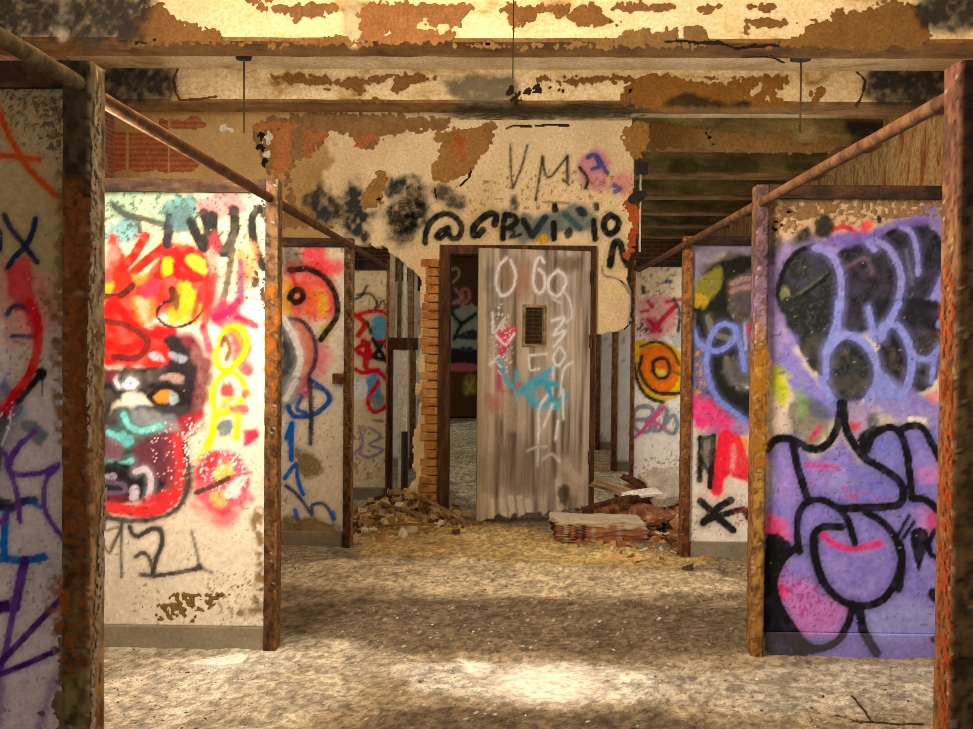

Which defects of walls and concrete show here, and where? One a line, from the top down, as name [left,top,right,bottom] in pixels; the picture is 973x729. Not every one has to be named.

peeling [98,0,723,52]
crack [664,40,785,63]
peeling [743,0,932,52]
flaking render [252,71,498,231]
rust [264,285,279,398]
rust [39,170,94,679]
rust [752,348,771,468]
rust [936,268,953,729]
spalling [155,584,243,623]
rust [238,513,264,615]